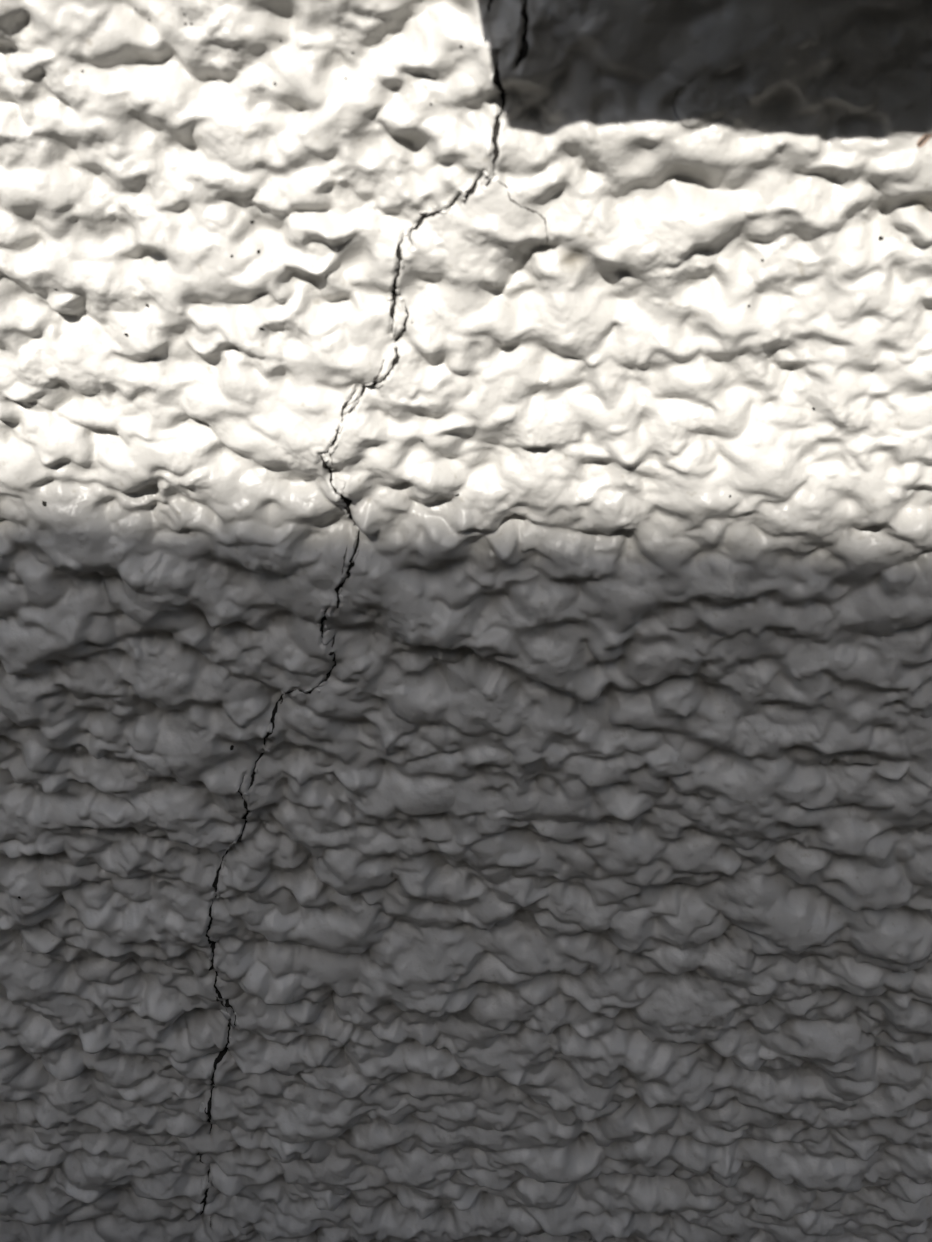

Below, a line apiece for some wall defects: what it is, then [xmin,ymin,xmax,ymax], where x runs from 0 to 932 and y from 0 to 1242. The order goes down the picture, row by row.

crack [196,0,548,1231]